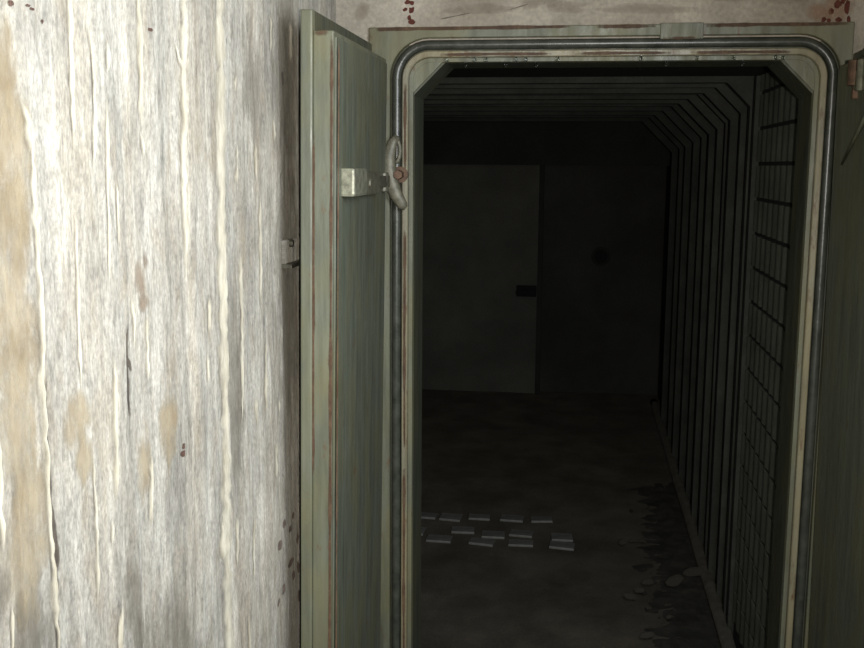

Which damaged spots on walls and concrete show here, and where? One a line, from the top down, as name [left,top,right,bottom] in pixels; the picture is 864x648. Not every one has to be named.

rust [378,0,566,31]
rust [715,0,851,27]
crack [125,329,133,415]
crack [42,378,60,580]